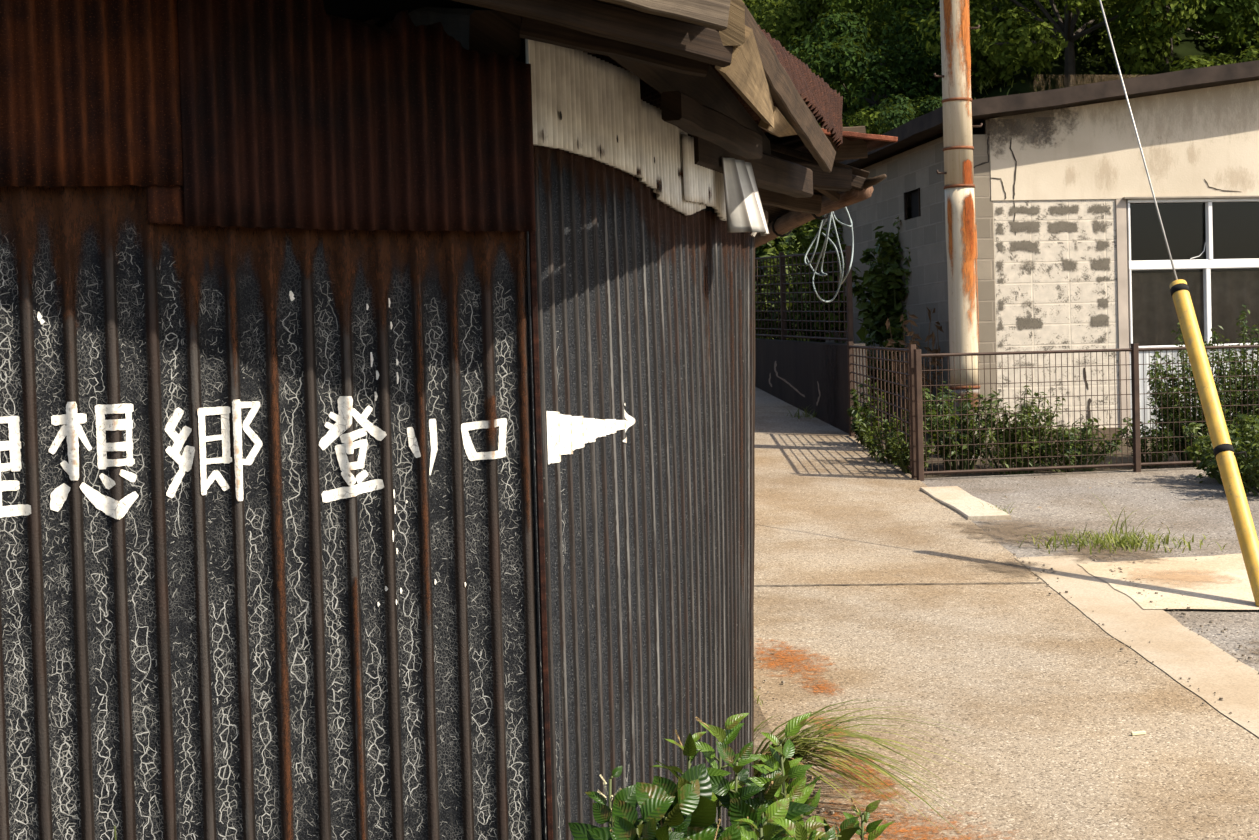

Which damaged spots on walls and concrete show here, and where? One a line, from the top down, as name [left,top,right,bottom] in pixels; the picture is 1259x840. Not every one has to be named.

corrosion [943,0,971,114]
leakage [985,107,1073,153]
crack [973,136,1017,235]
corrosion [947,159,979,338]
peeling [995,204,1111,284]
peeling [997,299,1043,347]
peeling [1090,297,1109,342]